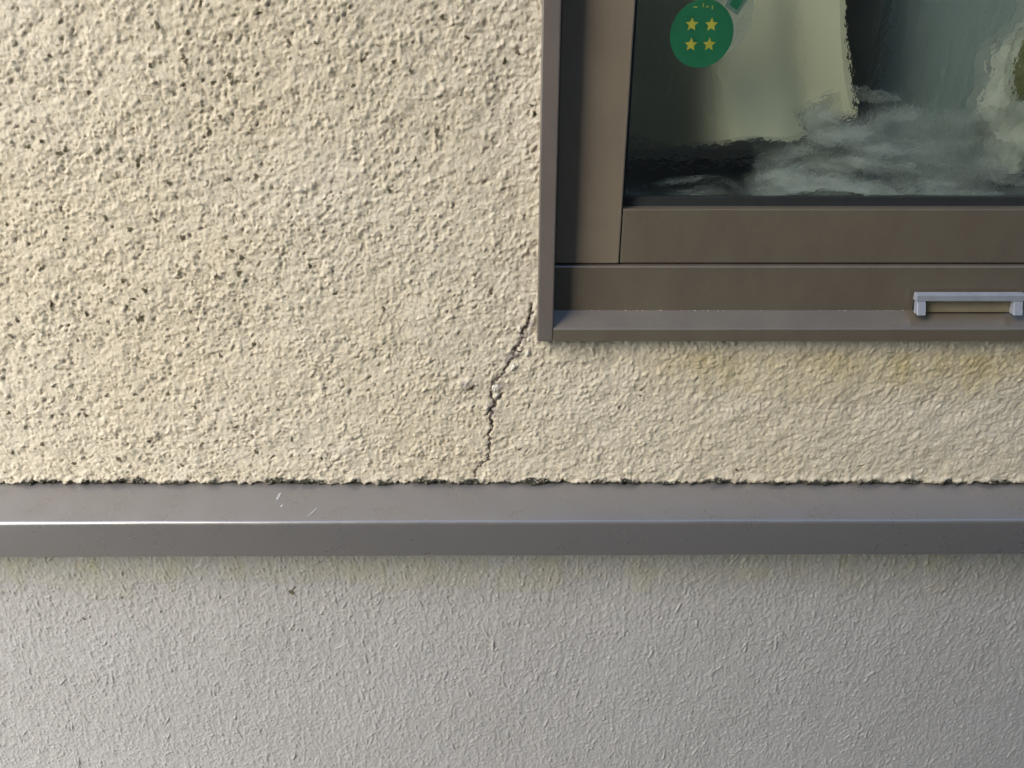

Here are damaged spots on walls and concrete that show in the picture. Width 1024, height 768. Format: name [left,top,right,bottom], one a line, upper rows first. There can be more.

crack [473,304,535,477]